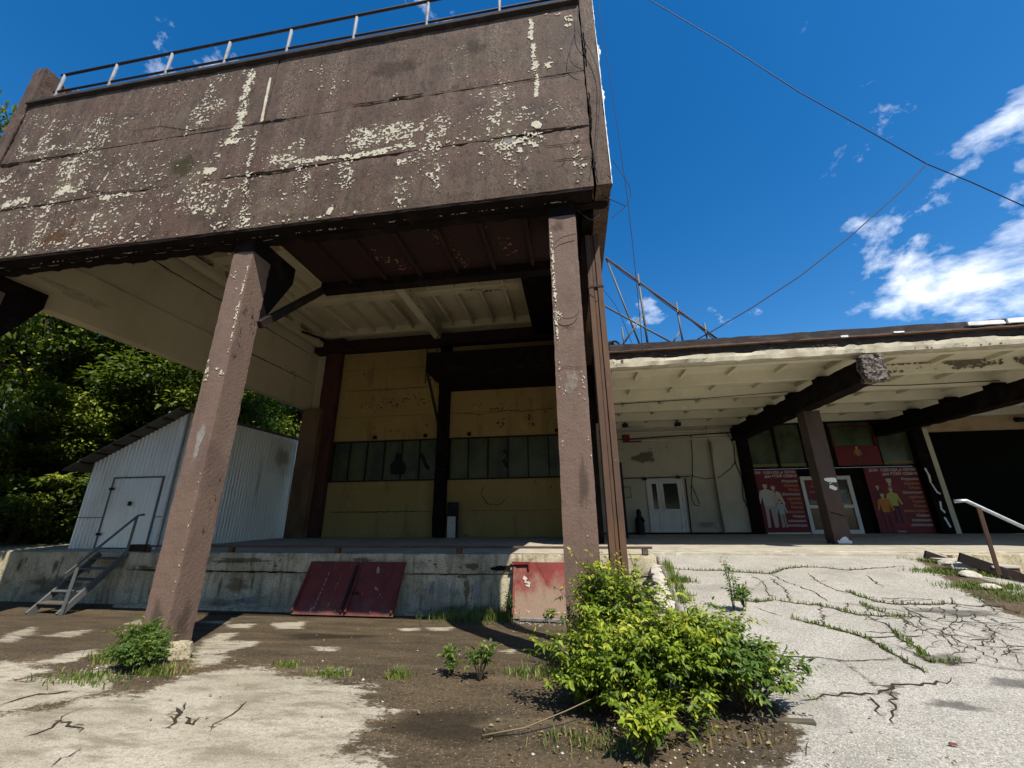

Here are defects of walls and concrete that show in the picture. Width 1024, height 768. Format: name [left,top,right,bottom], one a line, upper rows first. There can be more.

crack [0,113,86,167]
crack [252,165,311,175]
peeling [0,13,573,267]
peeling [550,232,562,343]
peeling [943,357,1024,370]
crack [680,566,1024,724]
crack [4,691,84,765]
crack [167,701,247,729]